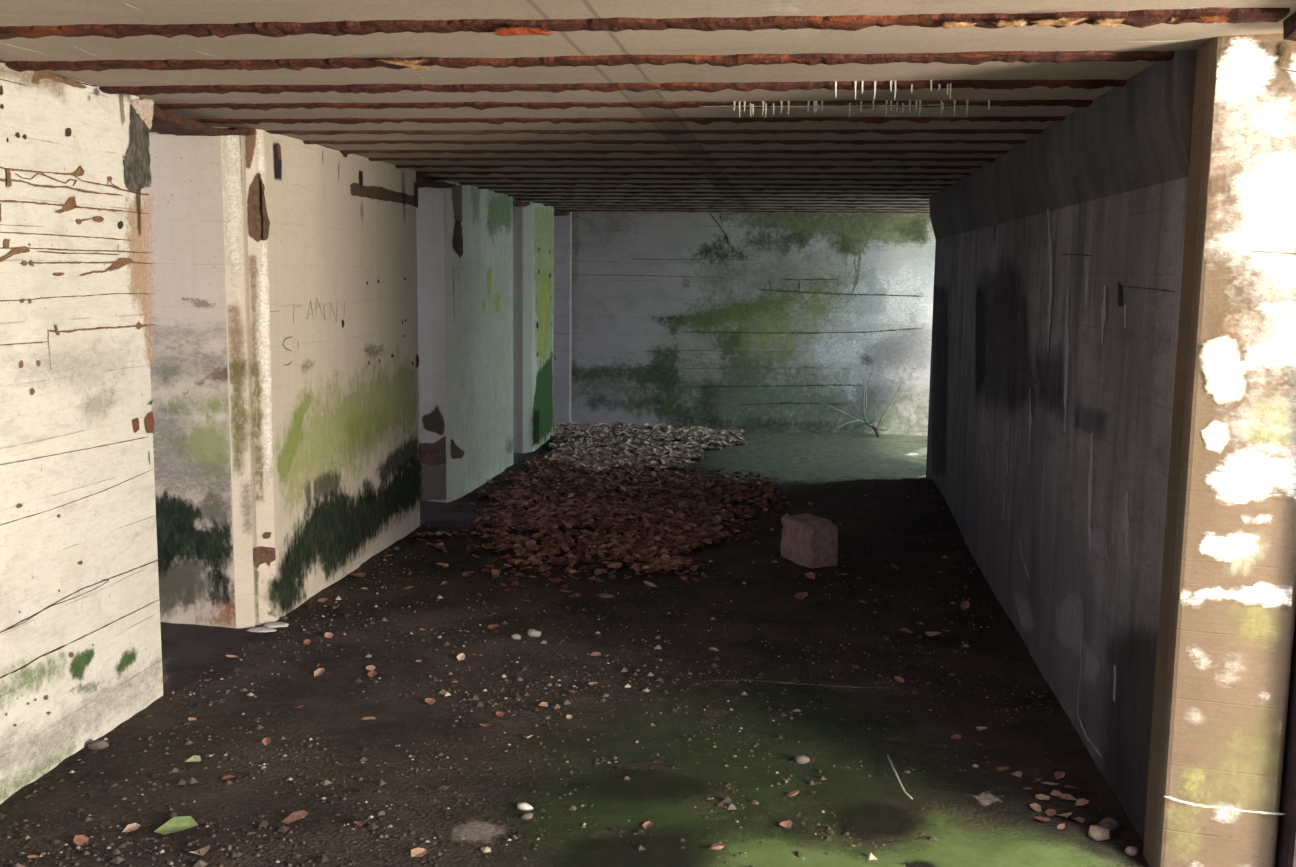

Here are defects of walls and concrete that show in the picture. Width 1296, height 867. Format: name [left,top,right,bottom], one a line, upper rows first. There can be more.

water stain [706,80,968,118]
spalling [124,98,154,235]
spalling [247,173,270,242]
water stain [1209,109,1270,180]
peeling [1213,37,1296,289]
peeling [1202,304,1296,403]
spalling [419,436,465,501]
peeling [1202,421,1296,504]
water stain [153,411,233,613]
water stain [271,407,445,614]
water stain [1182,583,1292,607]
water stain [1164,796,1286,819]